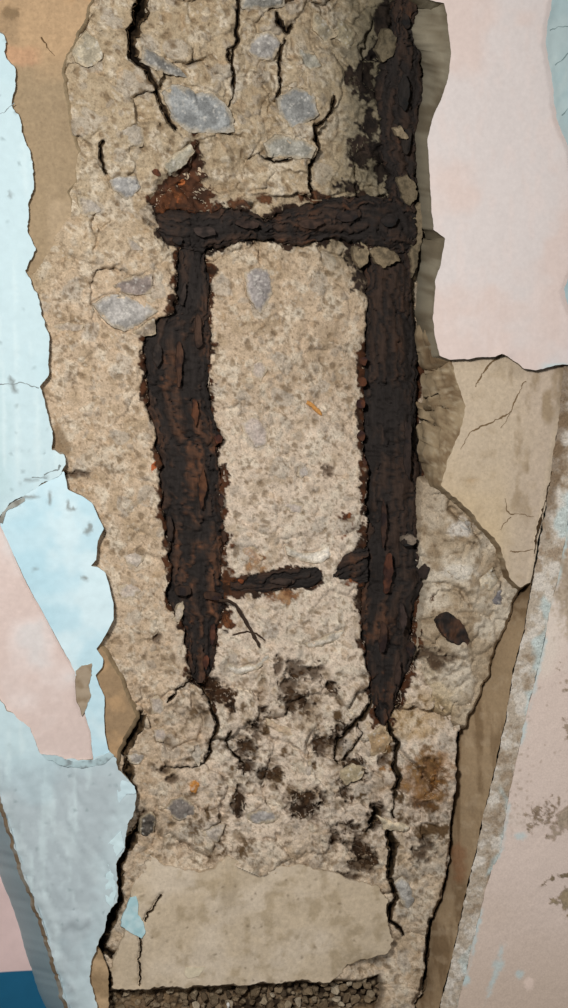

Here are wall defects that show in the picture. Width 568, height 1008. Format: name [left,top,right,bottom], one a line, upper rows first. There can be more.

crack [127,0,177,130]
corrosion [145,132,374,321]
corrosion [344,0,392,184]
peeling [0,470,114,759]
peeling [0,526,137,1008]
crack [98,822,162,990]
crack [121,680,245,792]
corrosion [150,428,324,714]
spalling [28,0,460,1008]
corrosion [338,340,369,550]
crack [333,696,462,999]
peeling [391,0,568,1008]